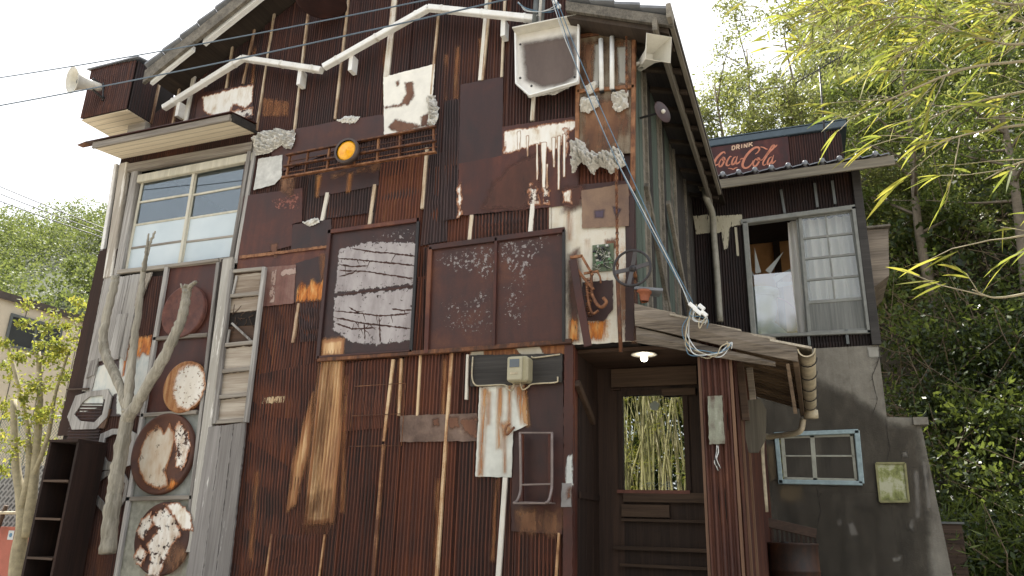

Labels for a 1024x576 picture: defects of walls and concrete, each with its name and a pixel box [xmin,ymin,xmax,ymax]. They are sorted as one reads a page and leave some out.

peeling [502,119,575,159]
peeling [527,183,573,206]
corrosion [296,280,323,302]
peeling [333,229,415,346]
corrosion [568,250,606,340]
peeling [137,363,206,490]
corrosion [287,337,344,525]
corrosion [433,385,528,475]
peeling [133,502,194,576]
corrosion [516,508,559,536]